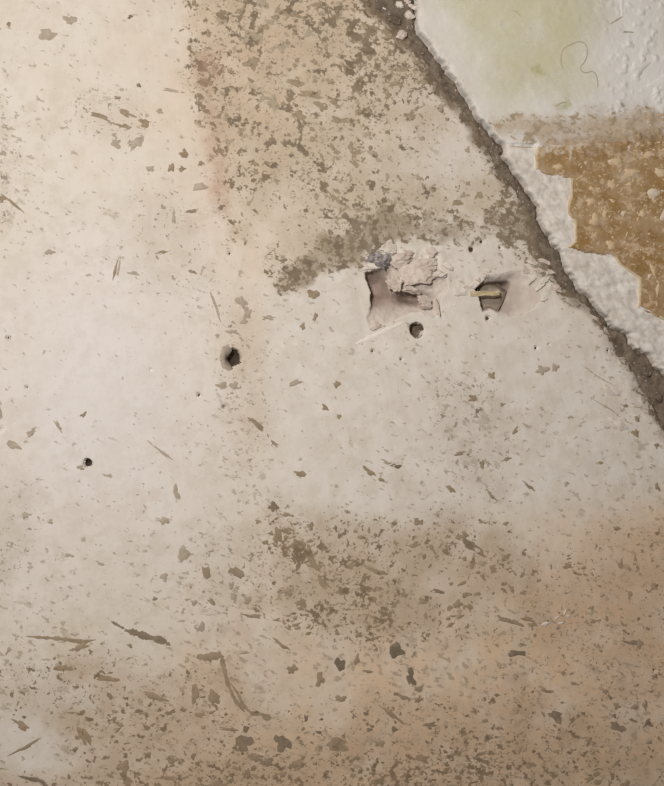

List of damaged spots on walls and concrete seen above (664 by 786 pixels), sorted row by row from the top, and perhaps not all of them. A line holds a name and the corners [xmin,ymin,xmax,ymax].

leakage [76,88,150,152]
leakage [163,0,547,299]
leakage [154,205,198,240]
peeling [535,129,664,320]
leakage [112,255,150,285]
spalling [358,239,562,331]
leakage [210,292,276,346]